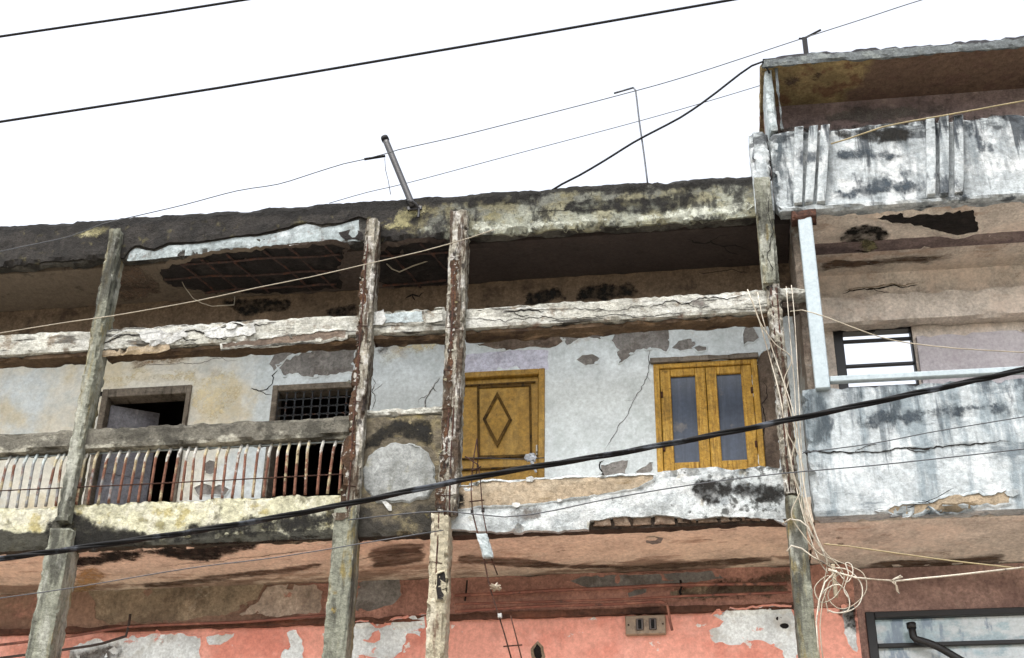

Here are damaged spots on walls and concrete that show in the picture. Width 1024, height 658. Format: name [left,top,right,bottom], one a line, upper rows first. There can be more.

water stain [773,106,1005,189]
water stain [528,180,752,228]
water stain [835,176,920,199]
spalling [869,206,984,239]
crack [846,282,917,293]
spalling [102,340,170,357]
peeling [475,330,708,367]
crack [599,353,650,475]
spalling [127,220,656,658]
water stain [692,480,784,505]
spalling [874,488,1019,518]
water stain [46,510,334,592]